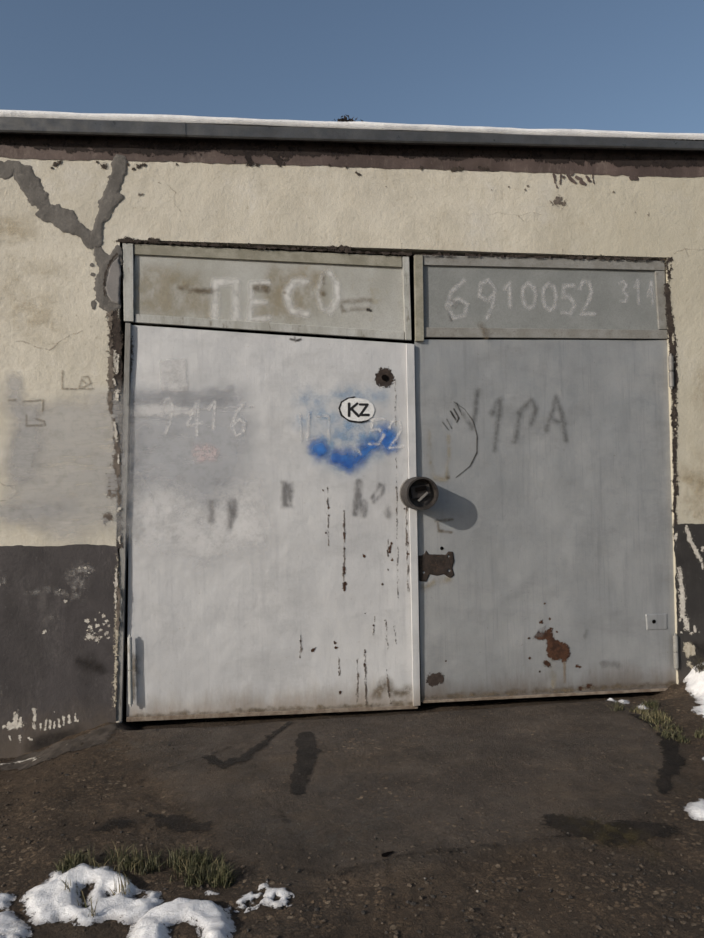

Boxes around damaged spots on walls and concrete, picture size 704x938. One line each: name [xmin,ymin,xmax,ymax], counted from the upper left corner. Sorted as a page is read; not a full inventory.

crack [0,154,127,312]
flaking render [549,173,595,207]
flaking render [114,236,704,579]
flaking render [84,310,134,707]
corrosion [387,480,410,598]
peeling [2,708,79,741]
corrosion [344,649,372,708]
corrosion [386,670,474,706]
corrosion [528,617,581,675]
peeling [676,566,697,669]